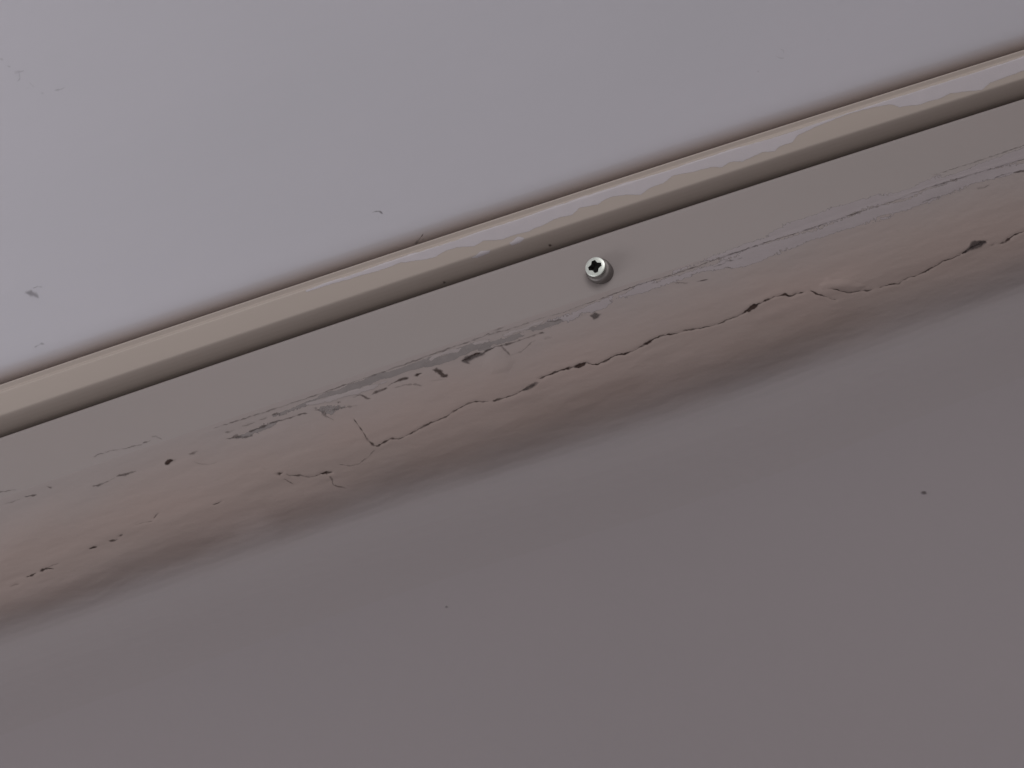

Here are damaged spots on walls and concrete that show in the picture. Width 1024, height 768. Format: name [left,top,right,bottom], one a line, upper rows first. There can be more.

peeling [235,319,563,439]
crack [540,232,1022,379]